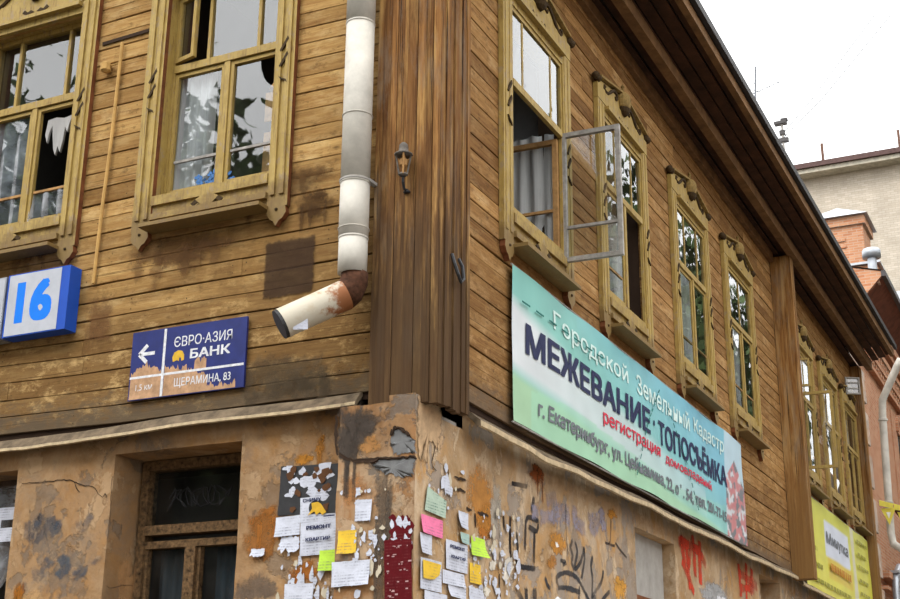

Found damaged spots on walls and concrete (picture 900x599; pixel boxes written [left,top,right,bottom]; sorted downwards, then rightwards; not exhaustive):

spalling [360,396,443,478]
crack [22,476,113,523]